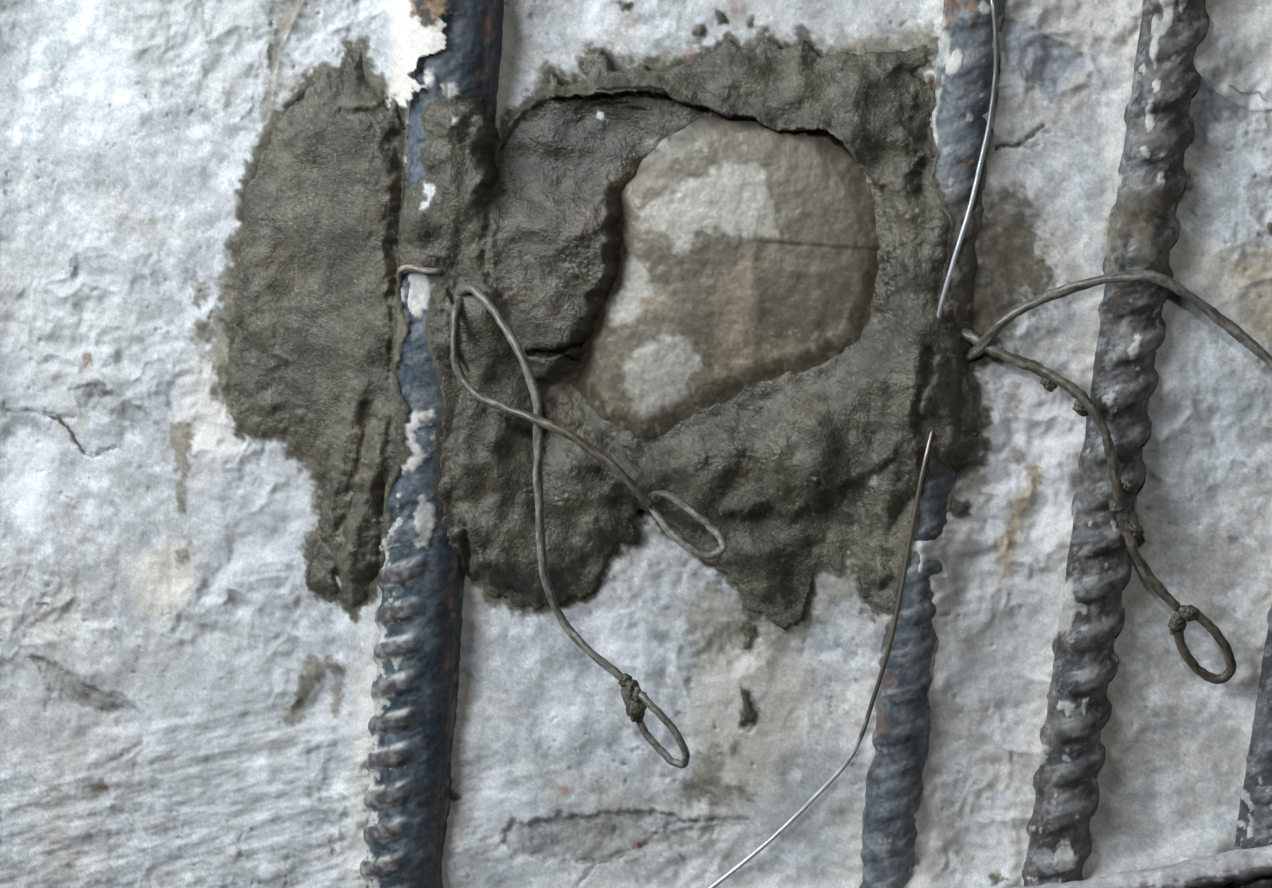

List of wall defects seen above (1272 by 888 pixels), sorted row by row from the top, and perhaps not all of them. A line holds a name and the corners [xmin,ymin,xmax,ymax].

corrosion [410,0,446,26]
peeling [388,0,458,107]
spalling [1001,20,1084,101]
crack [500,85,856,161]
spalling [503,811,739,864]